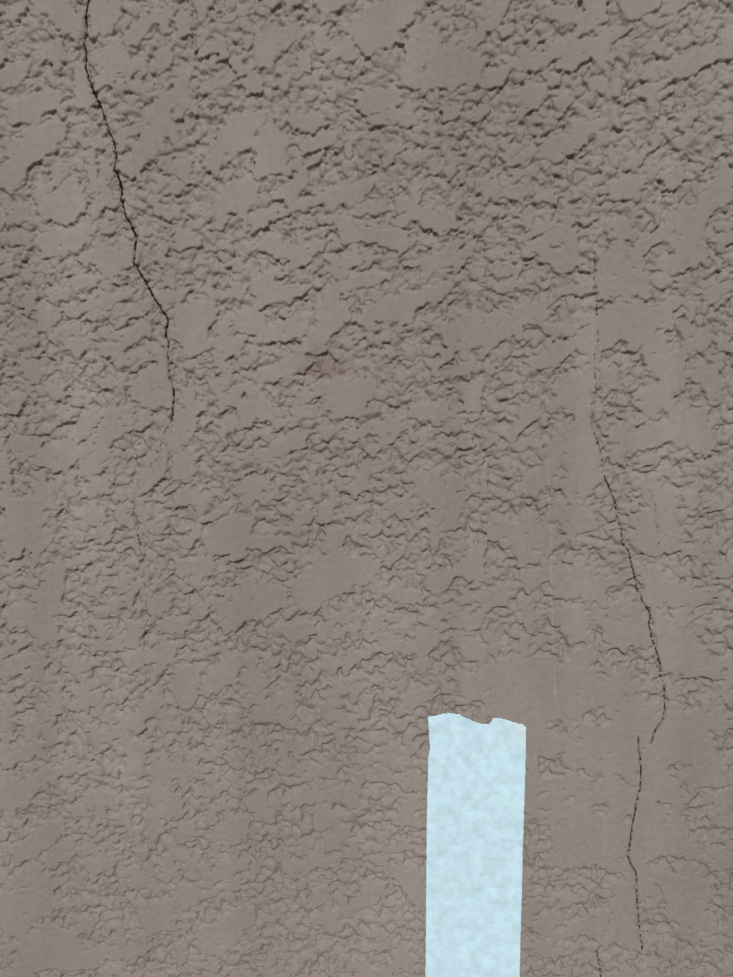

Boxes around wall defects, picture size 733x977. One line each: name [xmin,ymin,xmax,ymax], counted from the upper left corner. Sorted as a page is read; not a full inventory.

crack [80,0,175,645]
crack [591,260,668,948]